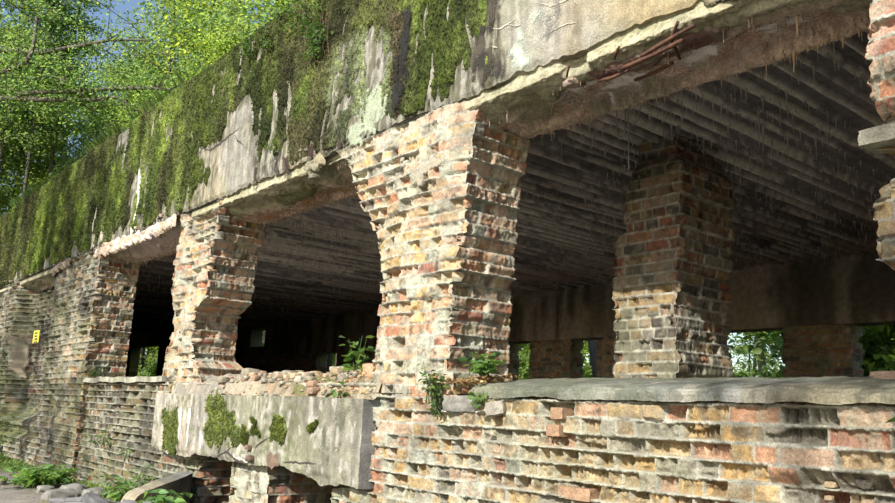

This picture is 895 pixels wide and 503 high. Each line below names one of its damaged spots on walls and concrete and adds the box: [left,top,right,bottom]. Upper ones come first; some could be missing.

water stain [675,43,723,67]
rust [553,9,848,120]
water stain [560,71,649,105]
water stain [271,156,289,179]
water stain [127,170,181,259]